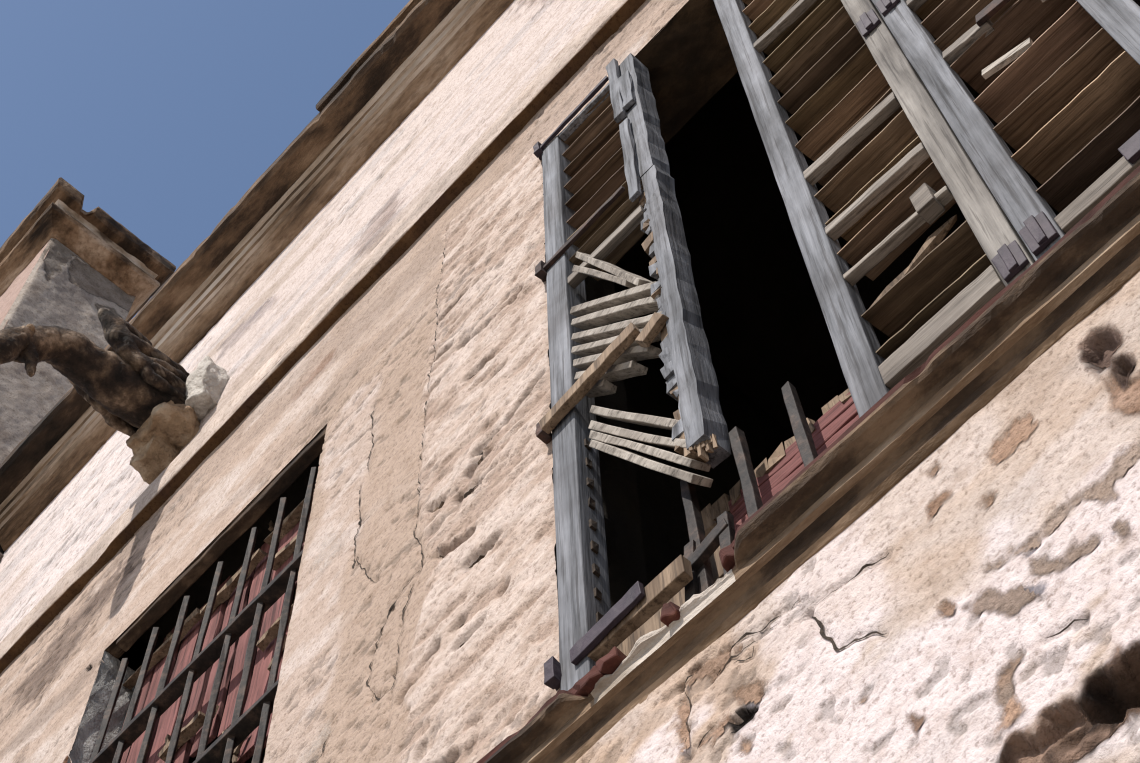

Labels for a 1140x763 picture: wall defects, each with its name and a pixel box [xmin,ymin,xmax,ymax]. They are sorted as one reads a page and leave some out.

spalling [1078,325,1140,414]
crack [352,230,447,702]
peeling [926,491,951,518]
peeling [987,413,1038,465]
peeling [981,443,1140,575]
spalling [676,644,764,758]
crack [684,553,889,758]
peeling [936,585,1039,617]